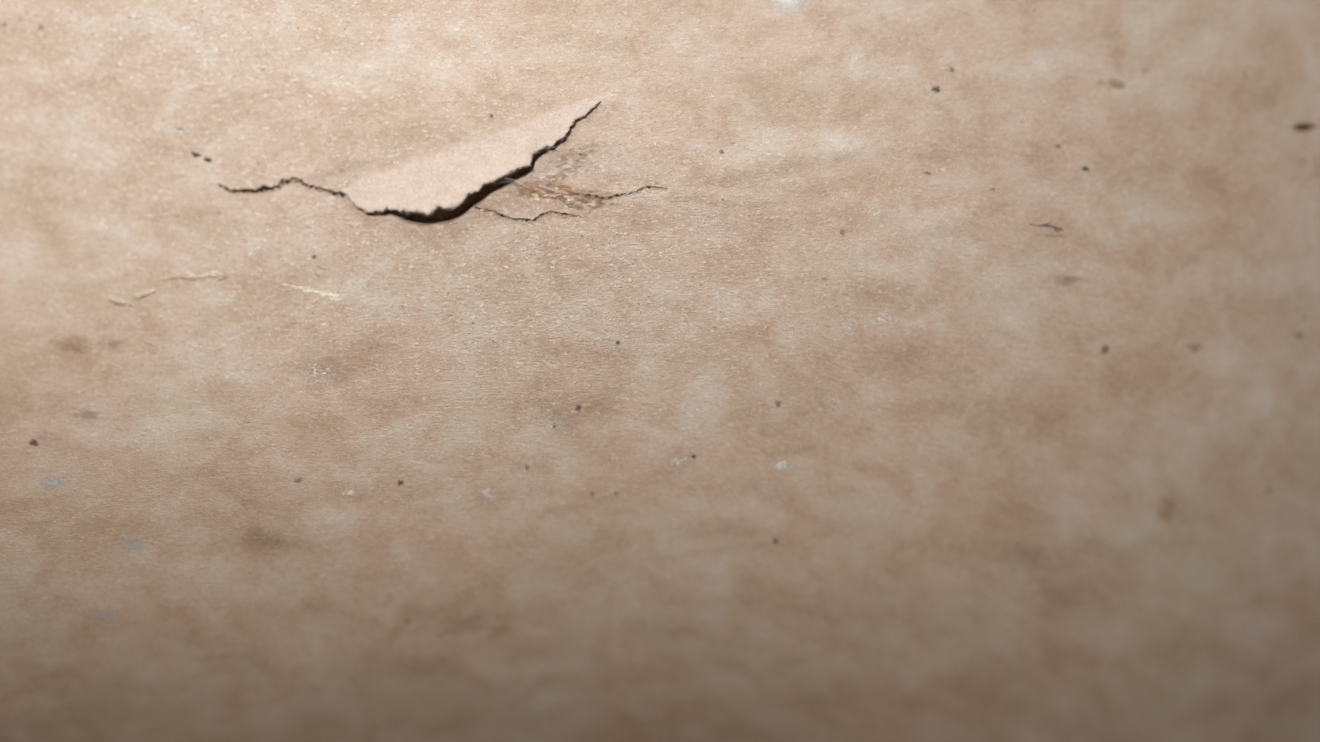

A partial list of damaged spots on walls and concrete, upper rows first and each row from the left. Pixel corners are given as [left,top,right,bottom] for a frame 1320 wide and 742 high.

crack [219,177,344,198]
peeling [474,191,584,220]
crack [475,186,667,221]